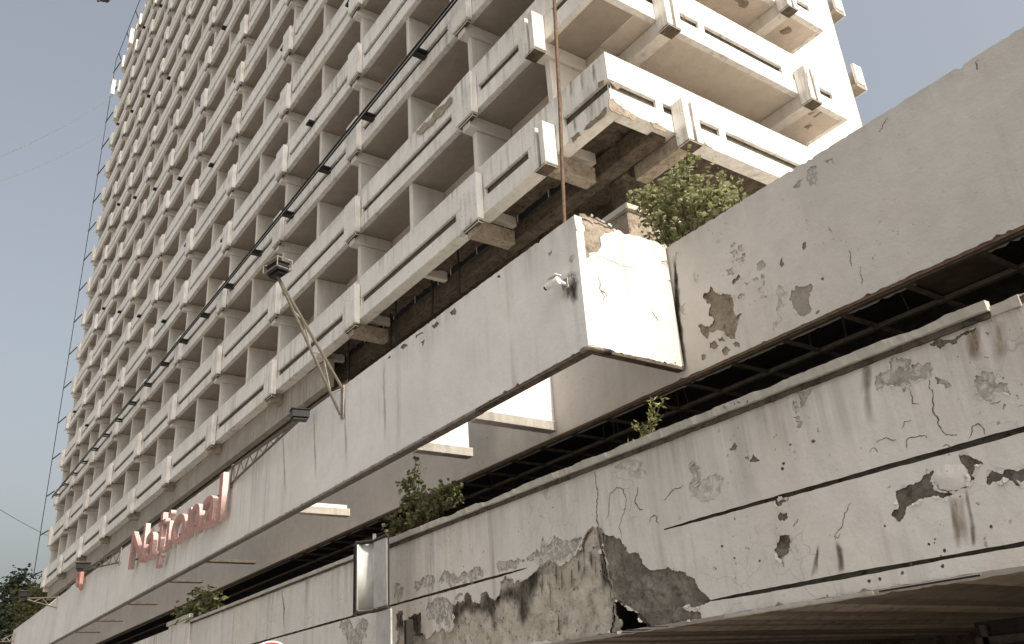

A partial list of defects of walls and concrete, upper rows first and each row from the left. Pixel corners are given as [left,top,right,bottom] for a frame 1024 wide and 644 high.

flaking render [575,213,614,259]
flaking render [693,242,824,360]
peeling [874,355,951,392]
crack [875,380,1001,451]
peeling [974,371,1010,402]
flaking render [884,451,1024,527]
flaking render [394,525,712,644]
crack [594,473,683,629]
flaking render [774,534,792,564]